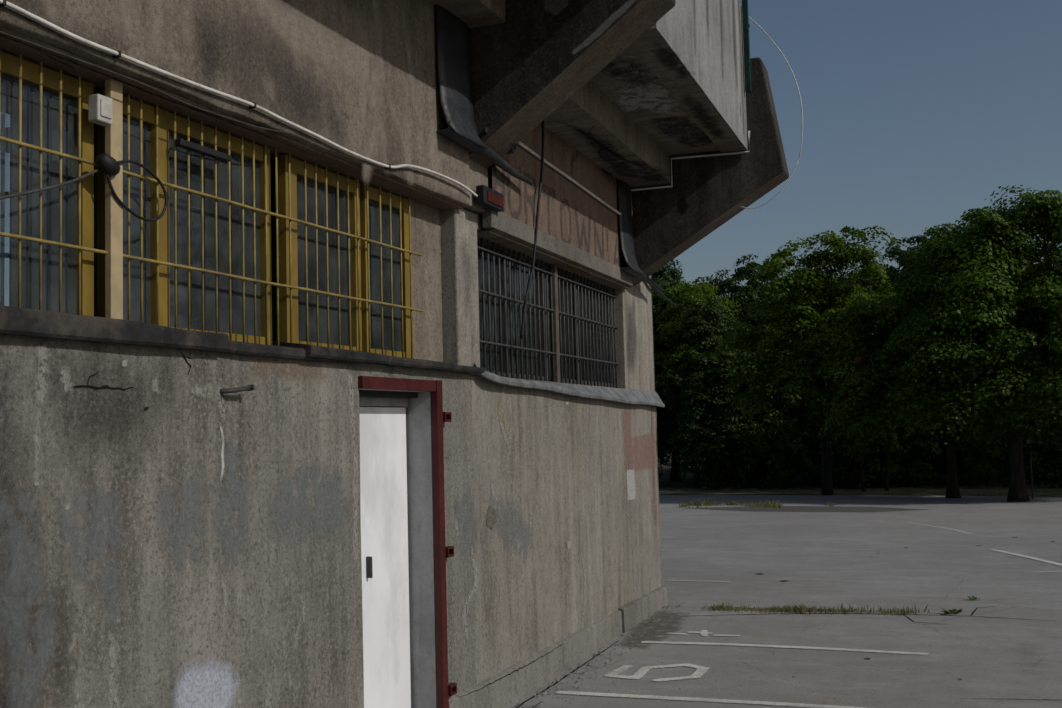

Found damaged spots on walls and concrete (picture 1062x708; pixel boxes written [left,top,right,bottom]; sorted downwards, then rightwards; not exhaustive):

water stain [601,56,723,146]
crack [68,372,134,391]